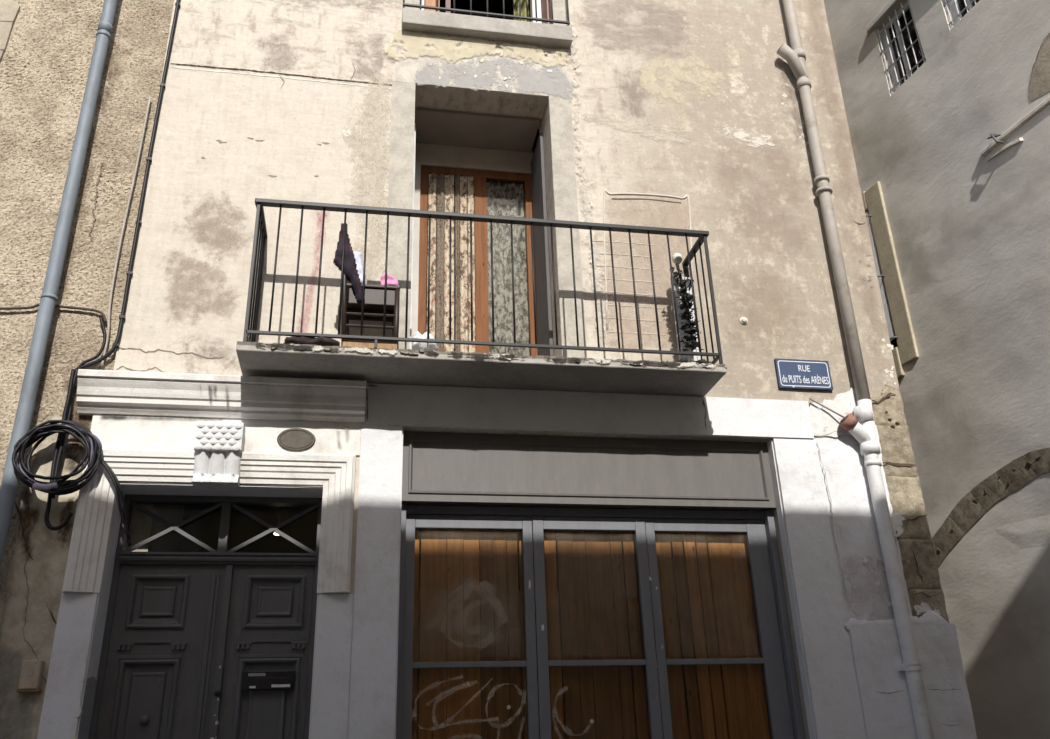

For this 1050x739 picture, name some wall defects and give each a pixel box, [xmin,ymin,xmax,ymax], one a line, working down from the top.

crack [170,63,392,89]
peeling [343,27,573,279]
peeling [722,124,775,148]
leakage [194,204,237,249]
leakage [174,261,230,316]
crack [107,347,225,373]
peeling [809,388,858,437]
spalling [870,366,949,623]